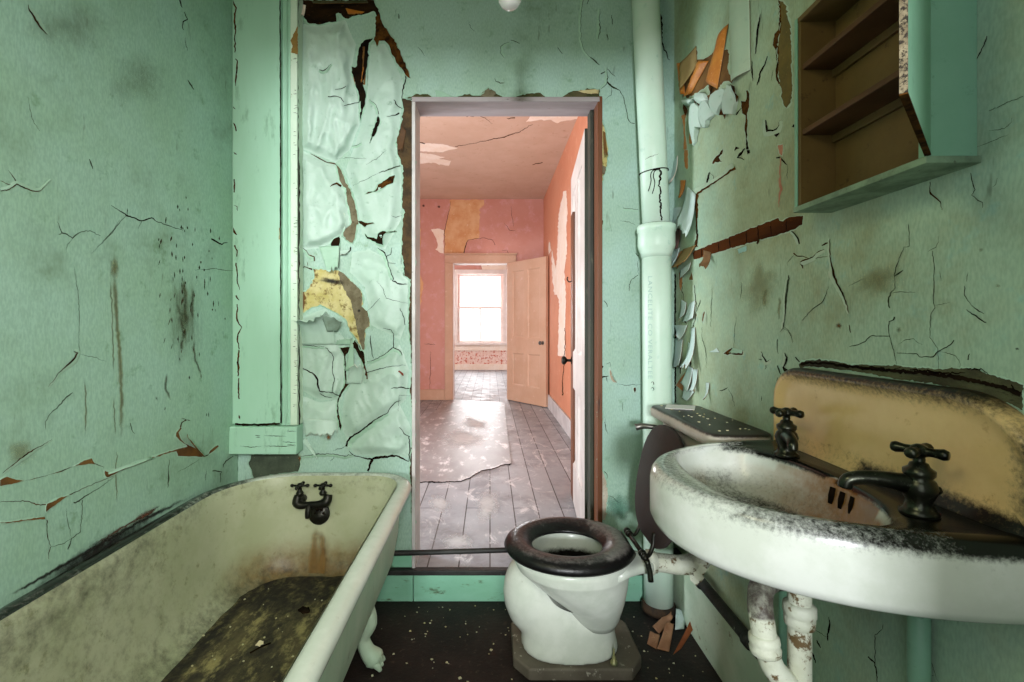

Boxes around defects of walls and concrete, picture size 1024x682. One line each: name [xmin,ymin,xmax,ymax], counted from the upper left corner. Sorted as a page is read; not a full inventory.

flaking render [301,0,382,25]
peeling [677,24,738,146]
crack [58,205,181,245]
crack [693,120,794,247]
crack [3,281,100,474]
corrosion [110,286,123,421]
water stain [158,225,226,379]
flaking render [303,267,370,351]
flaking render [395,86,546,548]
crack [674,274,736,403]
crack [759,224,970,401]
spalling [798,358,1024,412]